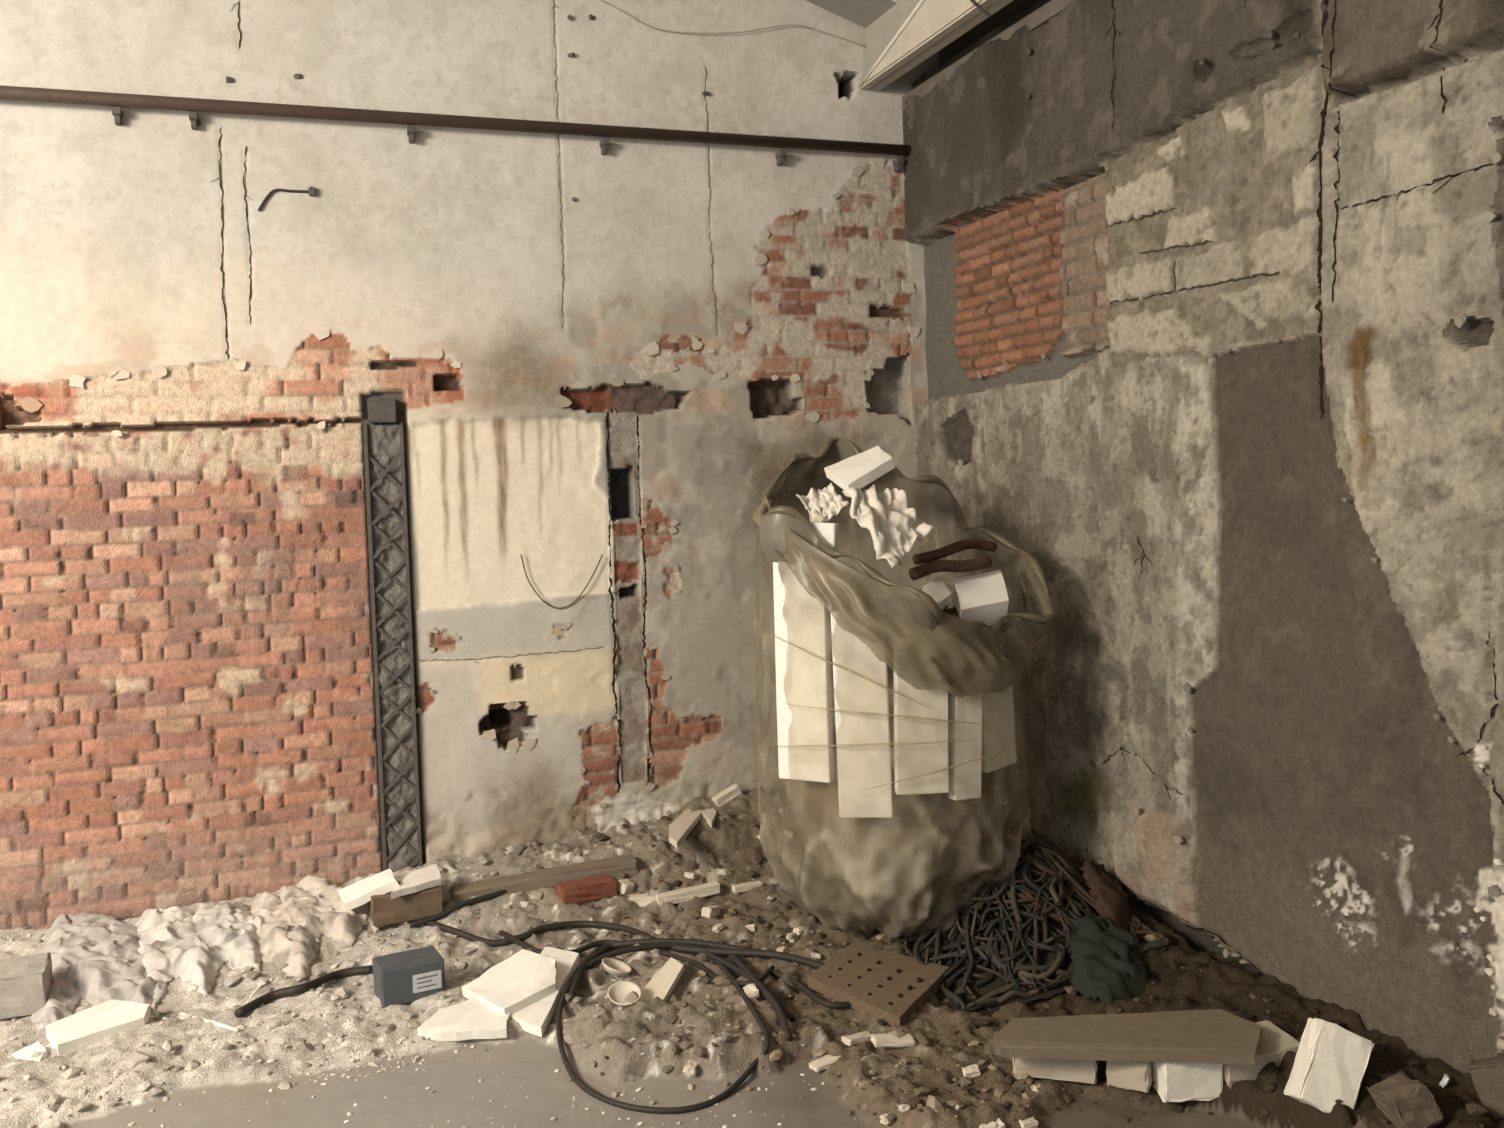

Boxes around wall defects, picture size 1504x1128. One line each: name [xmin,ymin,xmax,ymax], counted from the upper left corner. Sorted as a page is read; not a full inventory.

crack [1305,0,1494,419]
spalling [610,157,920,423]
spalling [936,186,1066,379]
spalling [0,327,466,436]
corrosion [1350,329,1373,466]
spalling [610,465,682,599]
spalling [479,701,538,753]
spalling [1124,333,1504,1128]
crack [1457,632,1504,805]
damp [1314,859,1374,945]
damp [1399,838,1413,911]
damp [1428,900,1477,955]